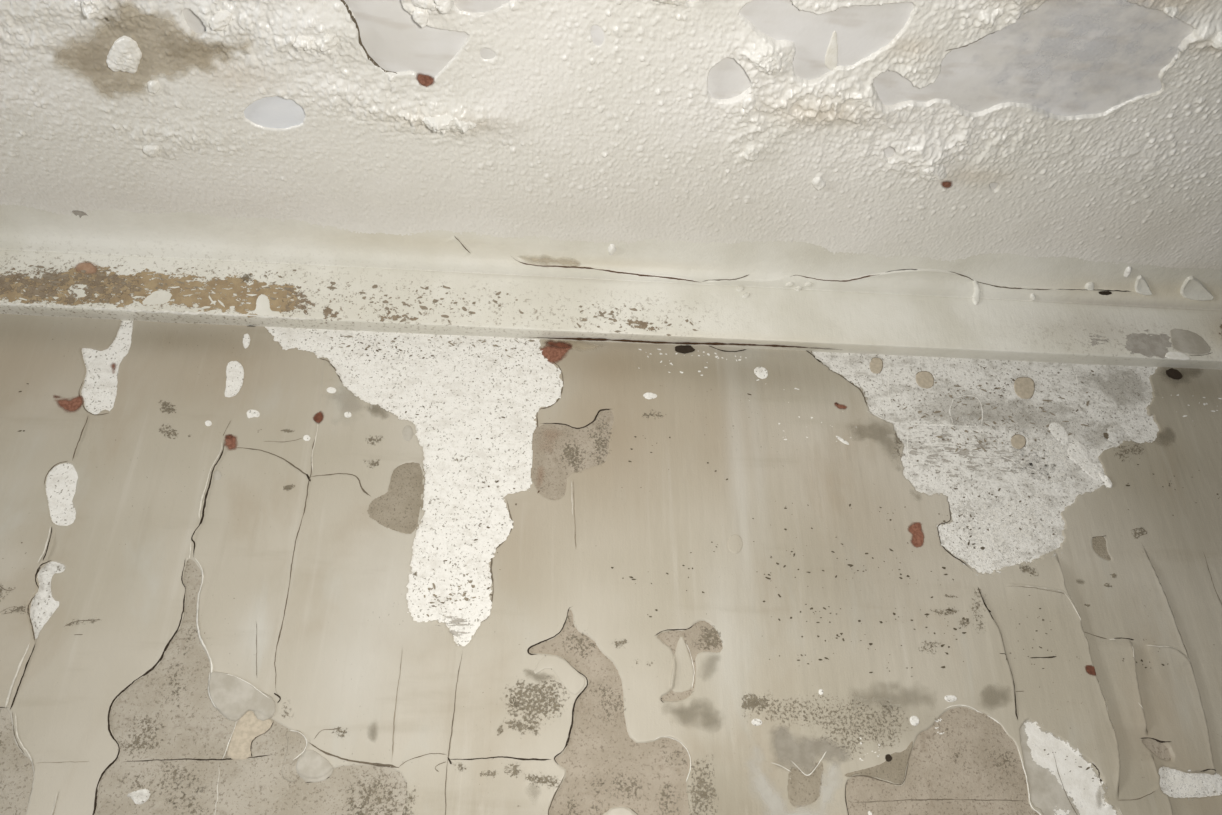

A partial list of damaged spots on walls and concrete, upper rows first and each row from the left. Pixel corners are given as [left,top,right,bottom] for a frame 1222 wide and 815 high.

rust [540,341,572,363]
crack [516,260,750,298]
crack [949,271,1130,305]
spalling [0,262,614,646]
spalling [811,329,1213,576]
crack [189,421,370,703]
rust [908,522,924,547]
crack [5,643,88,772]
peeling [92,557,407,815]
peeling [527,609,691,815]
peeling [742,689,1122,815]
crack [978,588,1057,719]